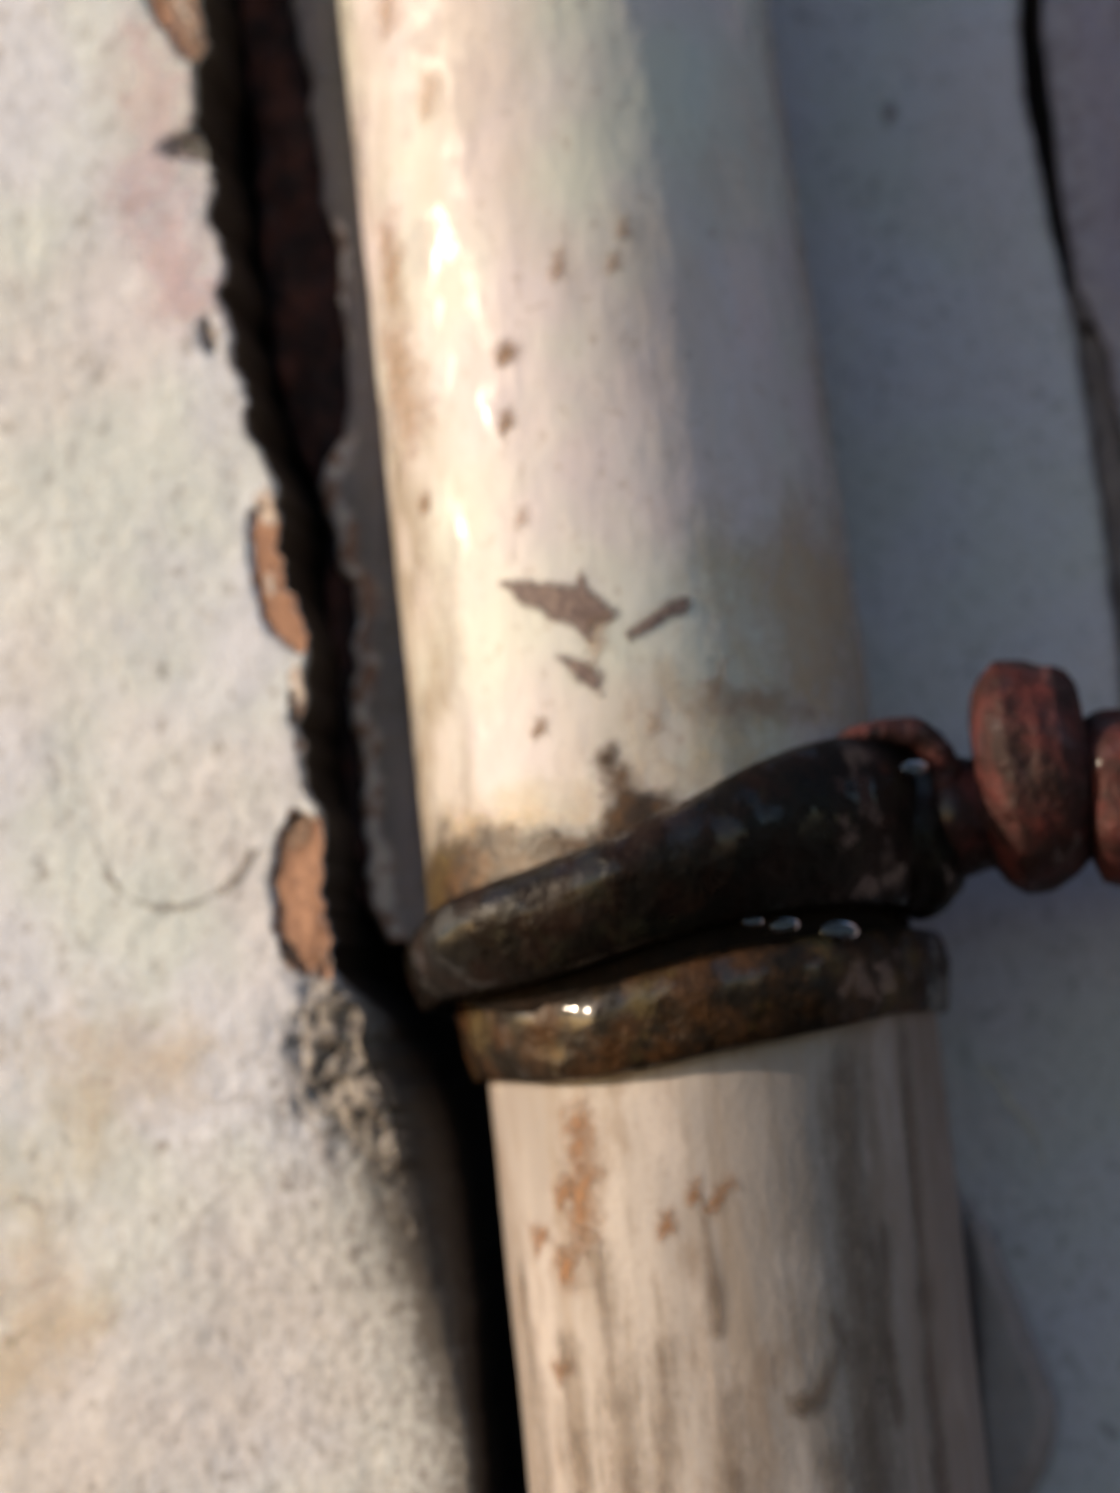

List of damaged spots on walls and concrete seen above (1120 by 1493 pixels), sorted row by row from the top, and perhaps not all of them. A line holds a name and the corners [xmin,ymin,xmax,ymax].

peeling [198,322,217,353]
crack [1019,0,1120,648]
spalling [248,487,307,752]